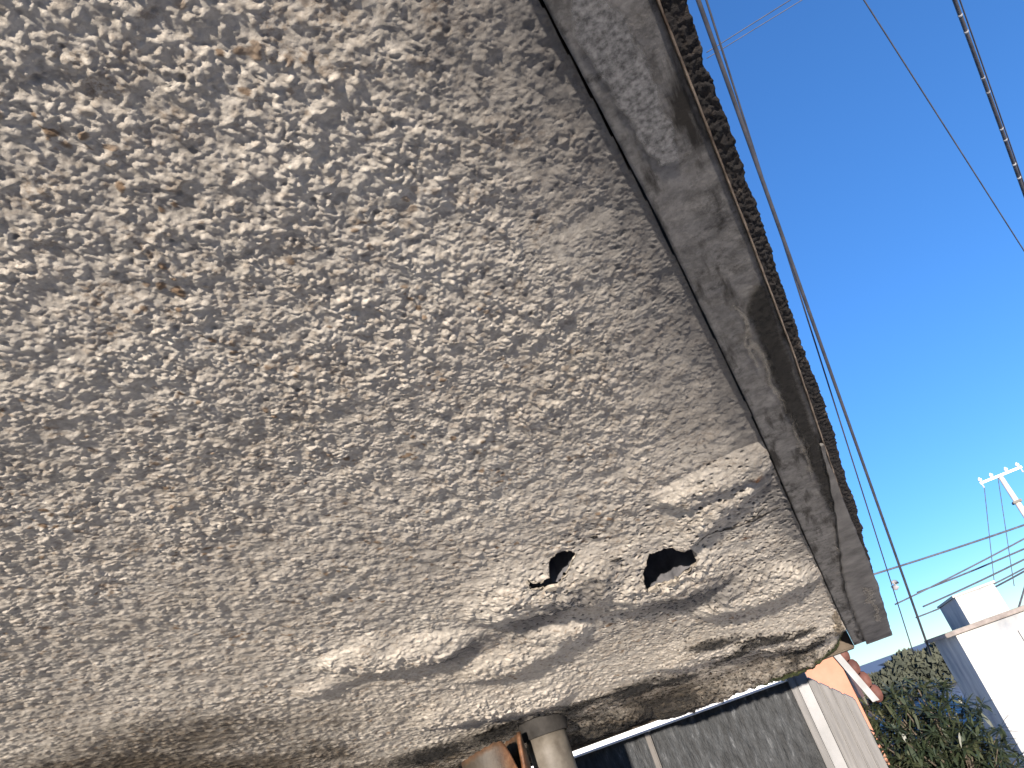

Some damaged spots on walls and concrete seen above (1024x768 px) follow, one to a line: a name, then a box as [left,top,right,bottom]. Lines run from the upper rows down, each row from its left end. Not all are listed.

damp [739,285,834,512]
spalling [528,551,575,592]
spalling [643,548,696,594]
damp [392,627,831,768]
damp [45,724,344,768]